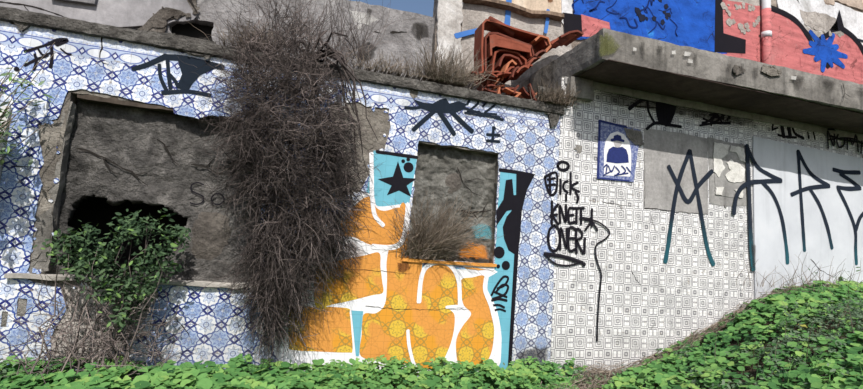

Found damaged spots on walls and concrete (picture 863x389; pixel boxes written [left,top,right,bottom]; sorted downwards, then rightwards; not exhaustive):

peeling [800,0,844,37]
peeling [27,120,61,274]